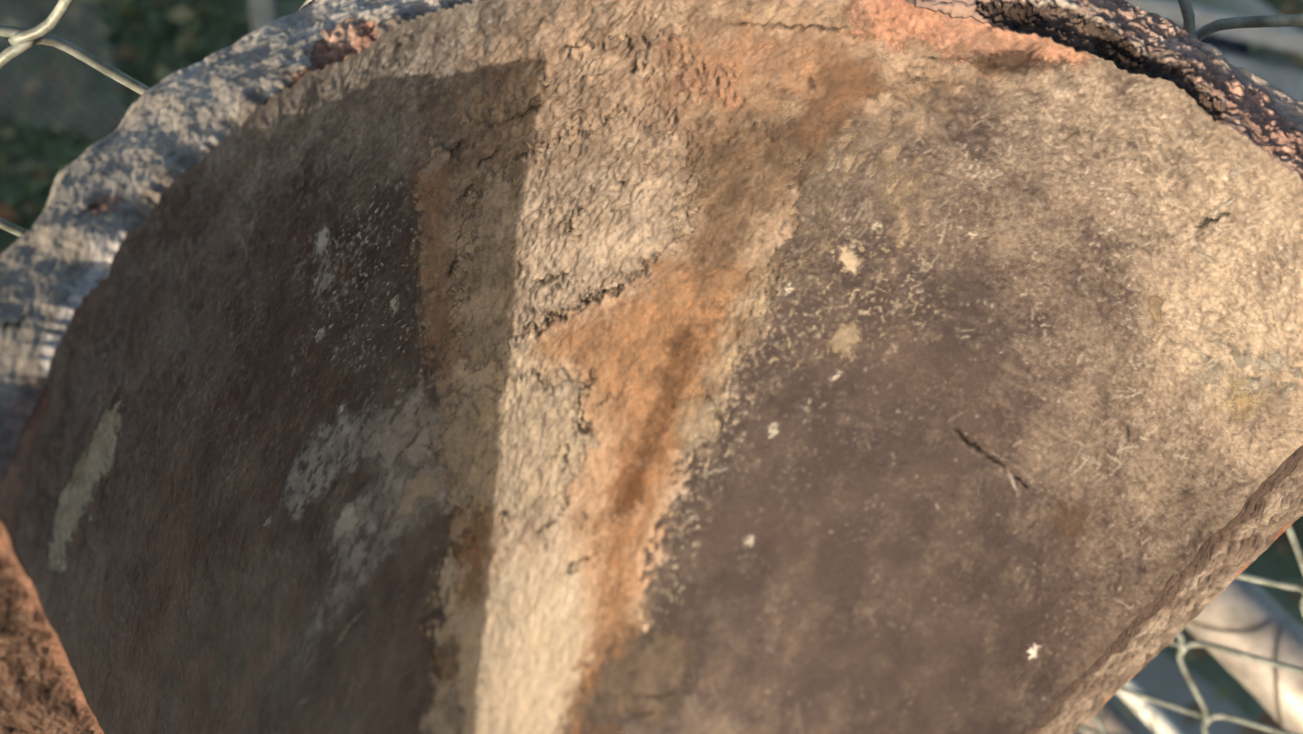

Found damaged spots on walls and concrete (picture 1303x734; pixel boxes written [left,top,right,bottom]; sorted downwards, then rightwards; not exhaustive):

spalling [0,522,104,734]
efflorescence [260,379,460,726]
crack [523,265,649,337]
corrosion [541,109,816,734]